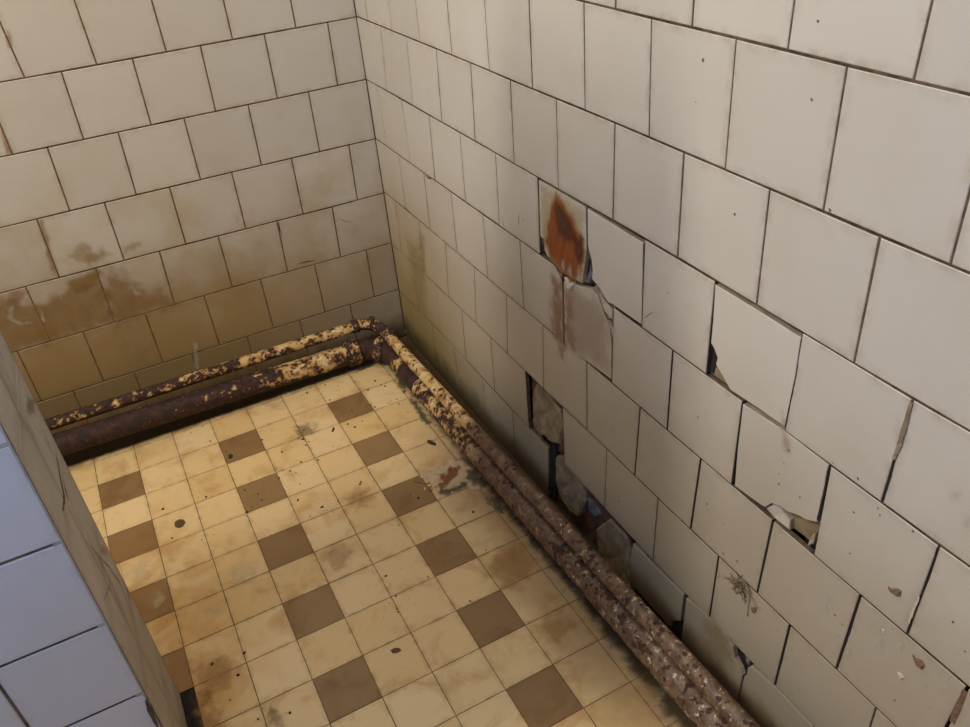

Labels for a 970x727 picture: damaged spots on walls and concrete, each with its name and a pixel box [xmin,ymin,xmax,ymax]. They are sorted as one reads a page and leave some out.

rust [545,194,584,280]
leakage [0,272,162,348]
spalling [710,347,727,384]
rust [420,459,481,494]
spalling [532,378,636,590]
crack [881,460,895,502]
spalling [766,504,821,546]